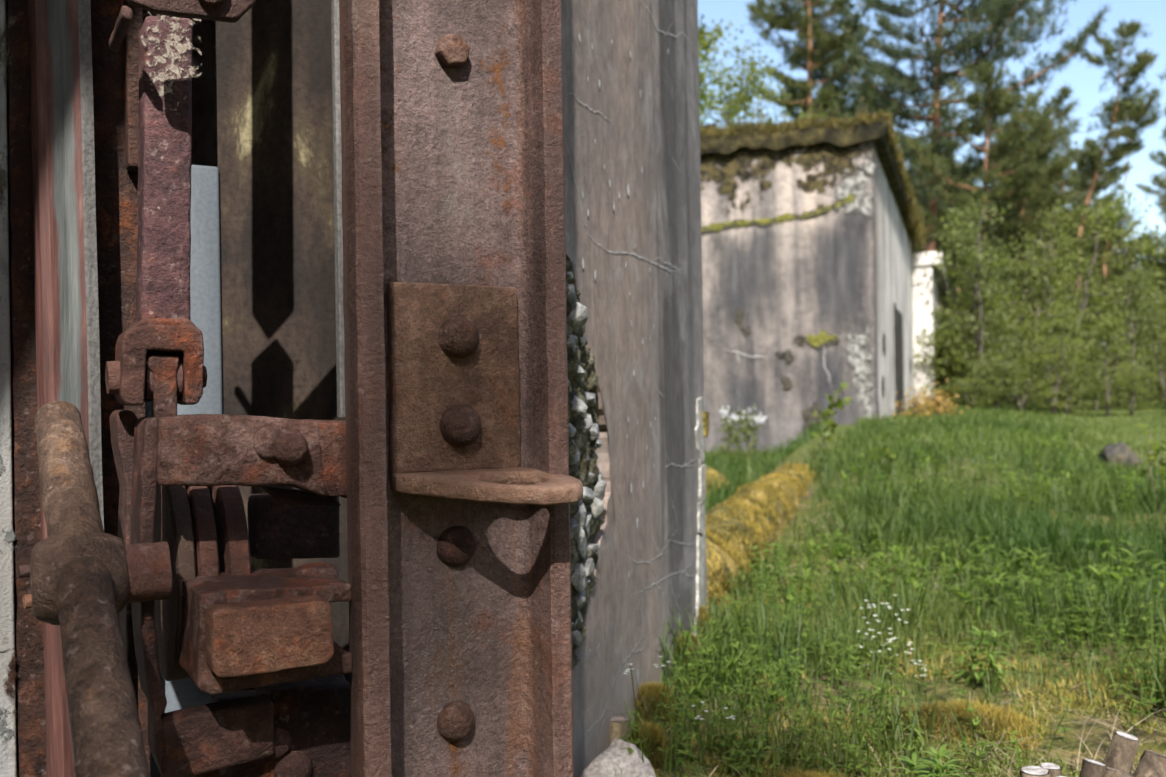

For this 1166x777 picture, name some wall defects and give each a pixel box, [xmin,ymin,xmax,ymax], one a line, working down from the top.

crack [565,137,685,272]
damp [818,222,864,320]
damp [806,353,842,427]
spalling [566,258,616,670]